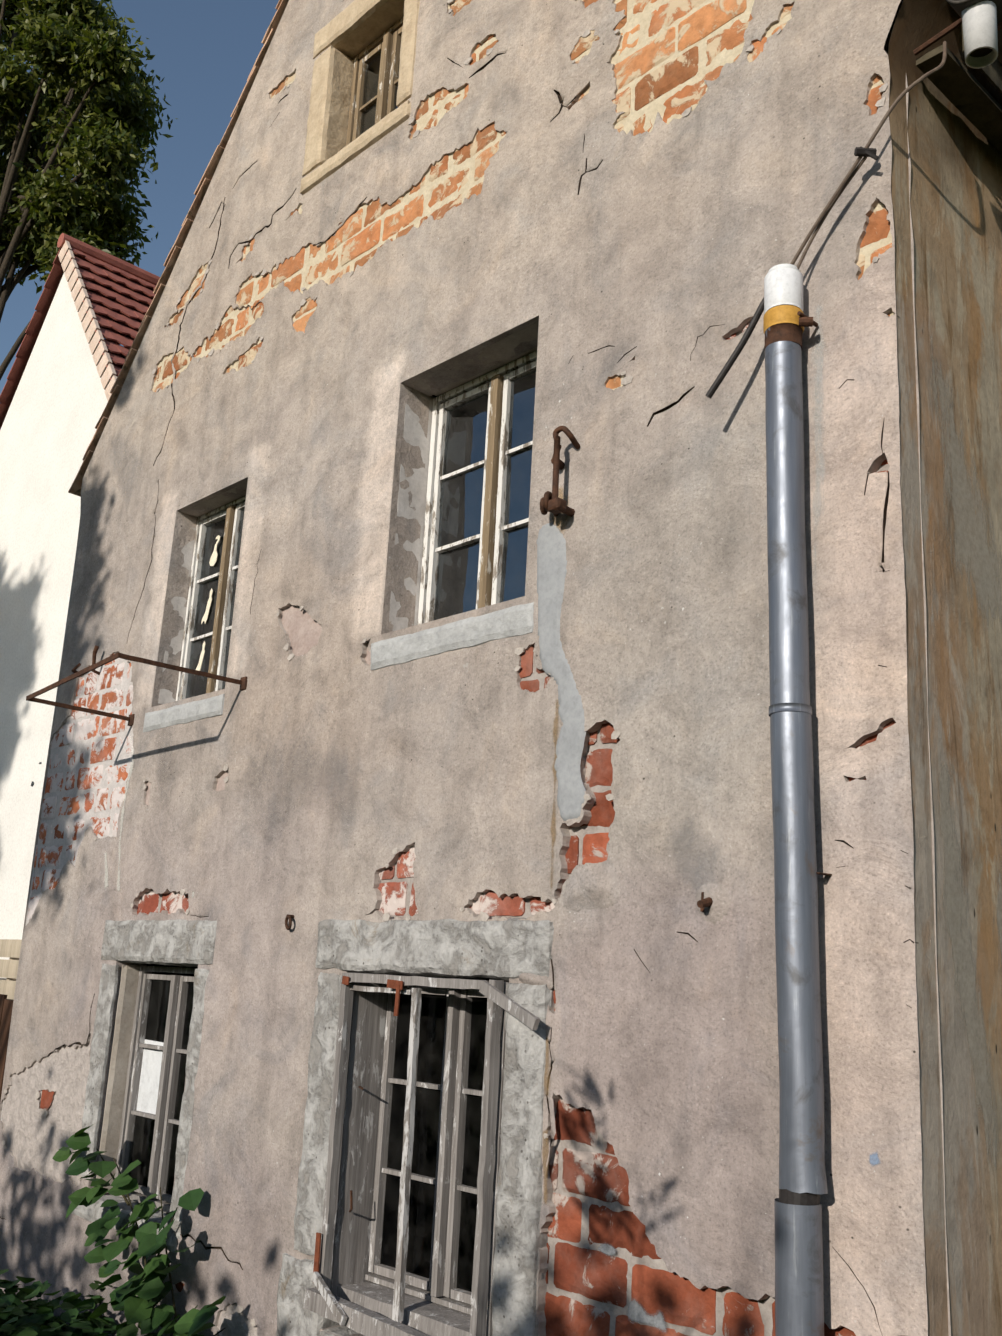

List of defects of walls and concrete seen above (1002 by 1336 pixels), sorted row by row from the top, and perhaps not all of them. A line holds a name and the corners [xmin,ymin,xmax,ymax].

spalling [566,0,795,136]
spalling [150,121,507,393]
spalling [854,197,892,281]
crack [125,160,296,644]
crack [858,417,892,572]
spalling [23,651,152,932]
spalling [130,888,190,916]
spalling [366,842,419,921]
spalling [459,720,621,921]
crack [167,1222,244,1270]
spalling [537,1093,776,1336]
spalling [824,1322,856,1336]